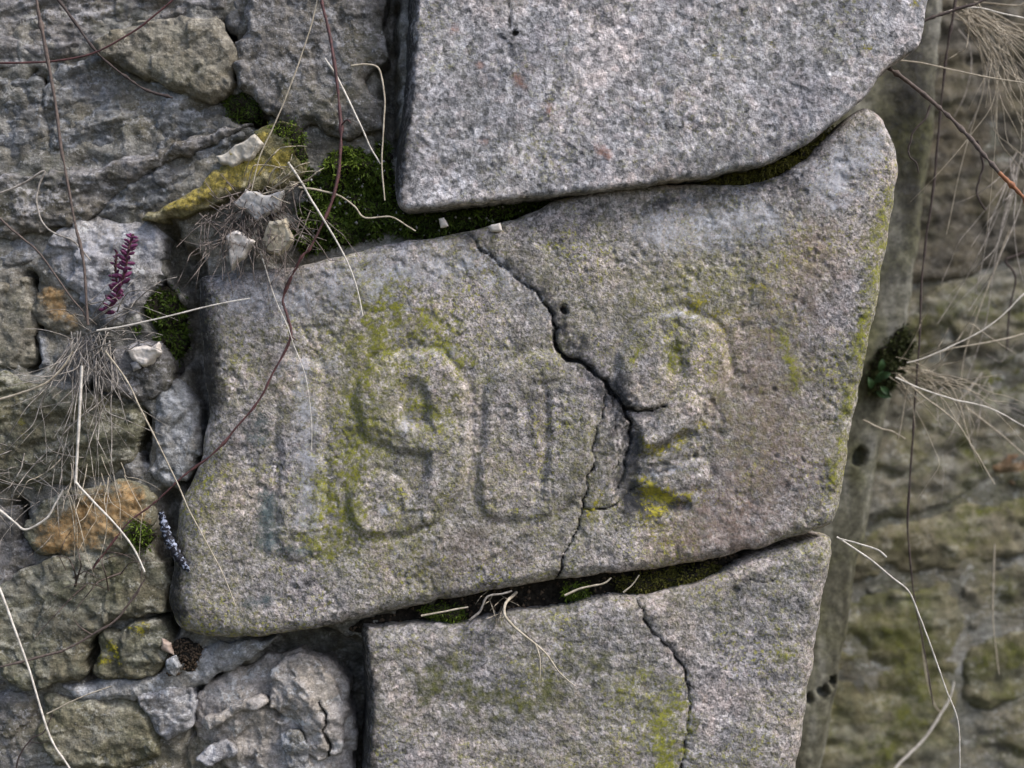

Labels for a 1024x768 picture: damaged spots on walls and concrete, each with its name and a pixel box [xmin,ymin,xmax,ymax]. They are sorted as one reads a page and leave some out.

crack [486,253,674,578]
crack [637,600,704,768]